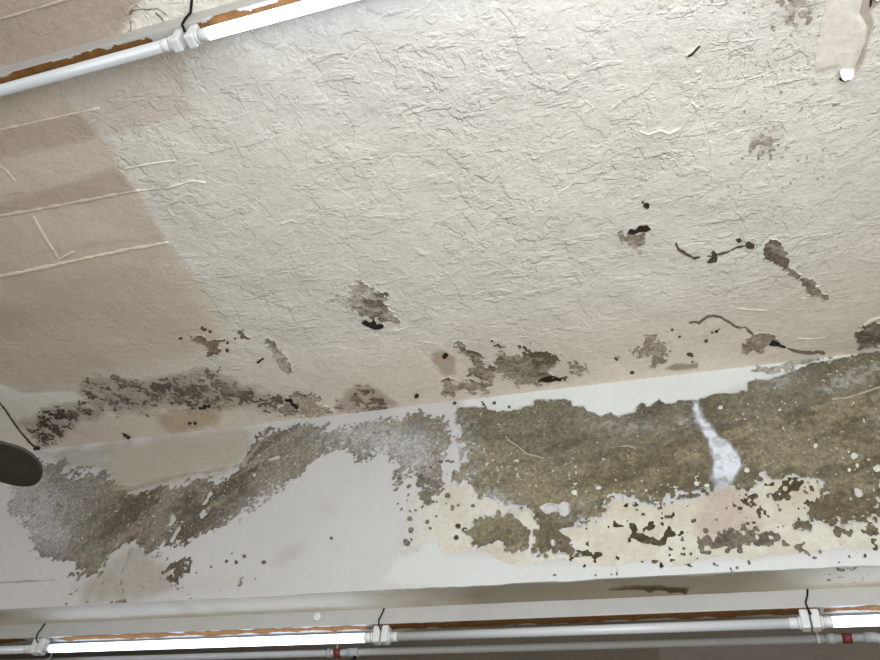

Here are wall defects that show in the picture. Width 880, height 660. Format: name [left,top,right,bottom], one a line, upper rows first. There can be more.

peeling [771,0,880,86]
peeling [742,110,790,160]
damp [14,366,290,446]
damp [334,385,390,413]
spalling [4,320,880,605]